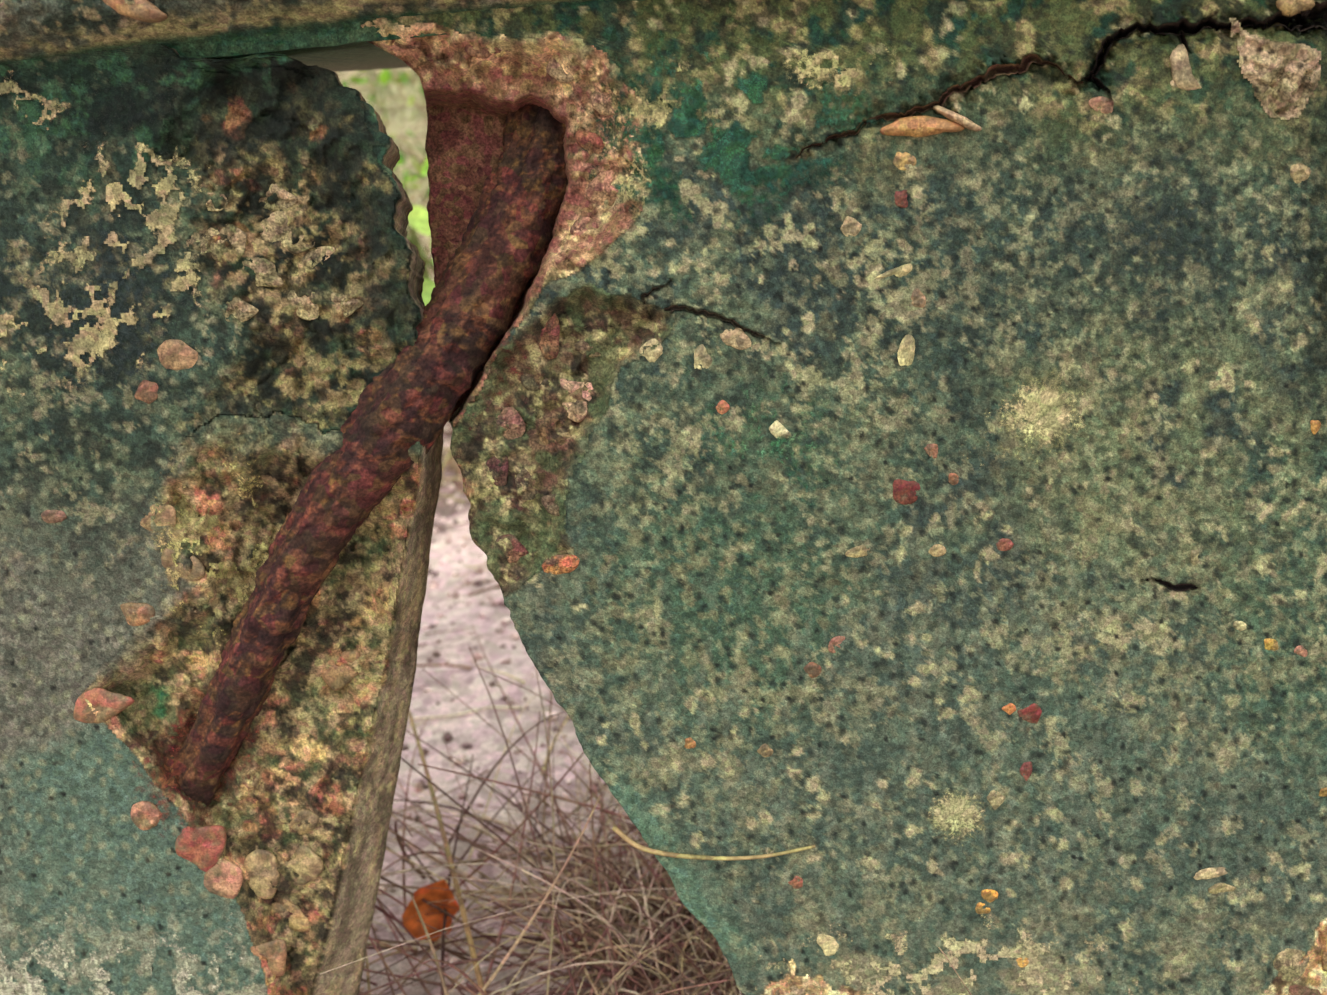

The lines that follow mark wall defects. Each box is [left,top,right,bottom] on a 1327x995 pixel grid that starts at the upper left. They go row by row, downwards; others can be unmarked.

peeling [0,71,67,130]
crack [795,1,1327,159]
peeling [0,313,28,338]
spalling [361,17,675,597]
spalling [23,67,420,995]
corrosion [133,692,263,830]